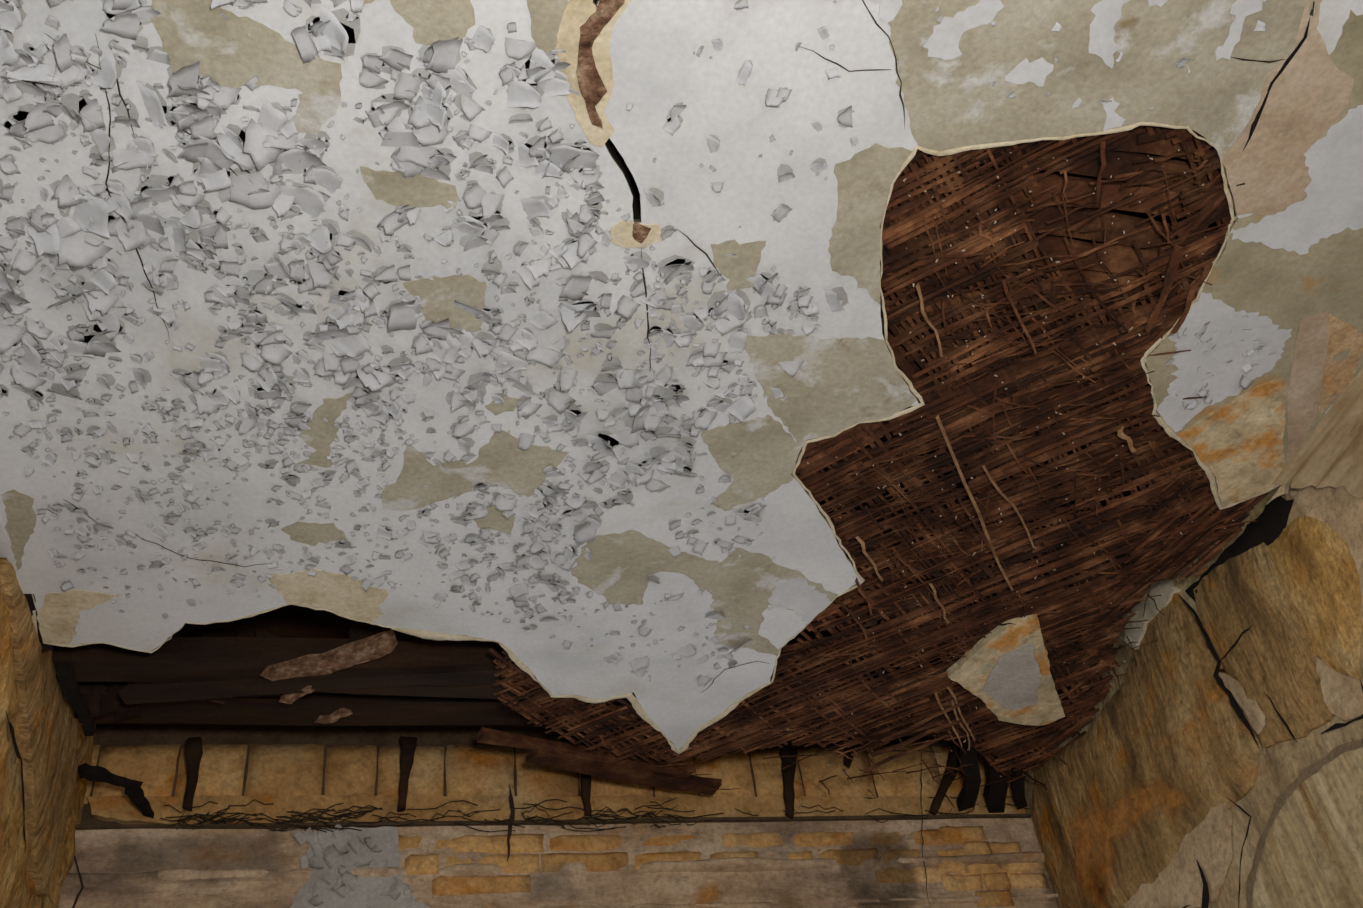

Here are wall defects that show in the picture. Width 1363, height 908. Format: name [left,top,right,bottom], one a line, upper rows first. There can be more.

peeling [837,105,854,128]
crack [799,0,905,125]
crack [1232,0,1322,151]
crack [556,0,722,370]
peeling [474,250,519,302]
peeling [56,407,118,468]
peeling [96,368,152,399]
peeling [122,351,245,526]
crack [1179,595,1363,747]
flaking render [290,824,784,908]
flaking render [911,826,1022,856]
crack [1182,798,1252,908]